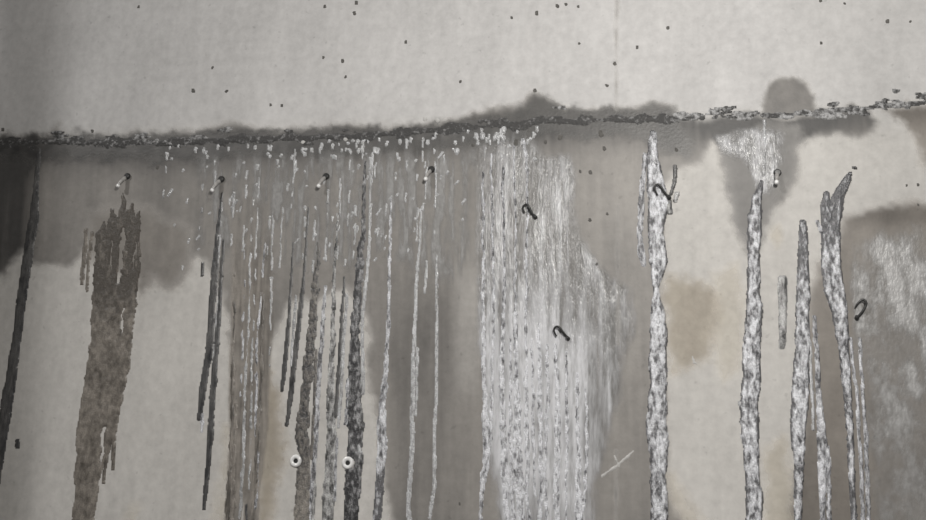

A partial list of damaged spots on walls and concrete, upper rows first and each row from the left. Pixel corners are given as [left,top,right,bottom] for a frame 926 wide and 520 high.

leakage [0,93,877,520]
leakage [762,77,816,113]
leakage [777,166,926,520]
leakage [889,105,926,165]